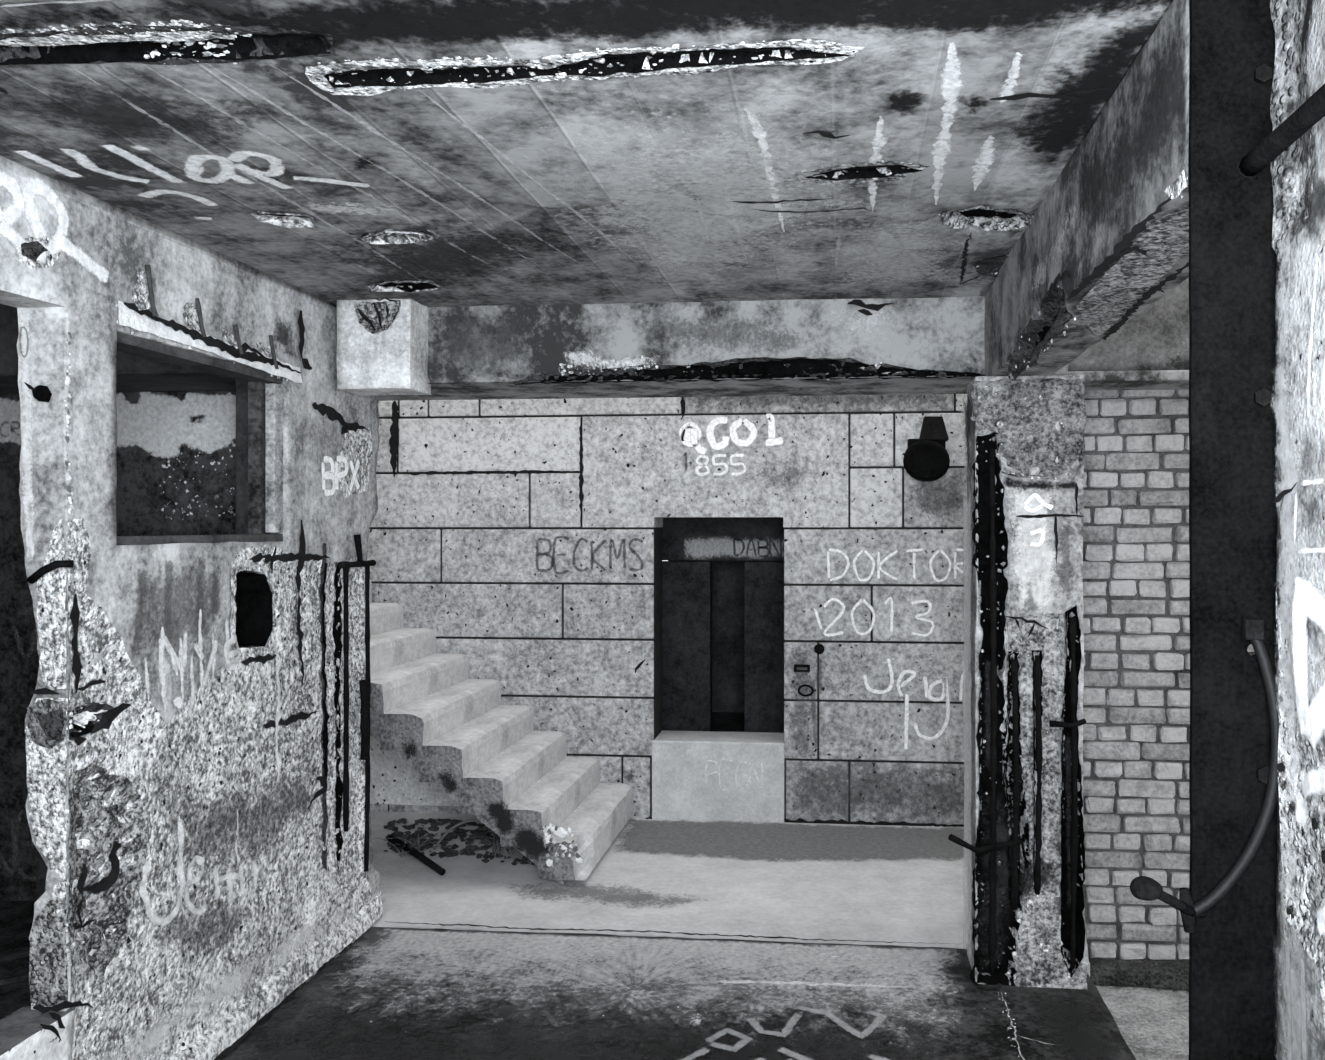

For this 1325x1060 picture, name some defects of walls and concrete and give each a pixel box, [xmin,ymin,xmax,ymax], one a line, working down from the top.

spalling [0,19,865,97]
spalling [795,160,931,186]
spalling [508,170,1189,990]
peeling [0,313,373,1060]
crack [999,992,1053,1060]